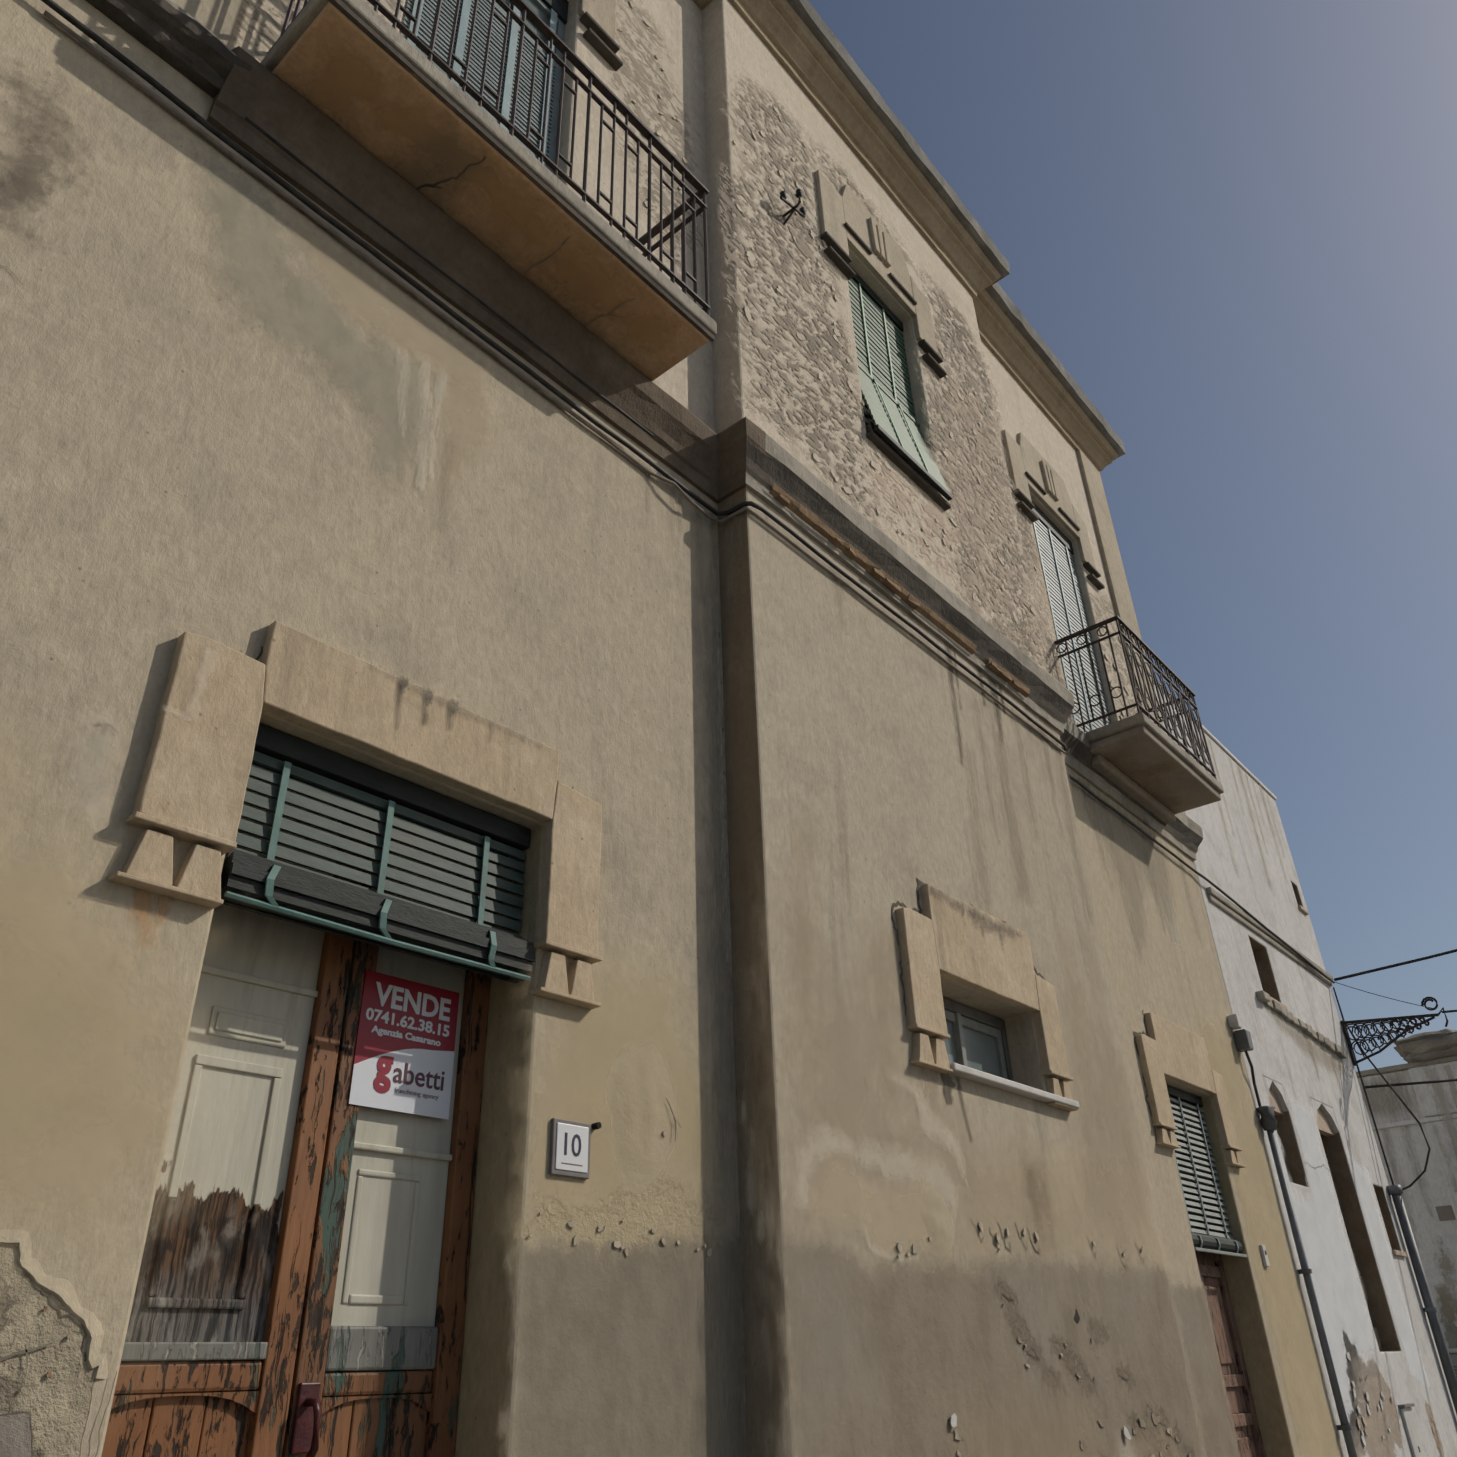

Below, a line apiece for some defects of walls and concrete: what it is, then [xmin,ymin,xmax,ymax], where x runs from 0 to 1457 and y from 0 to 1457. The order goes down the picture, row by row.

leakage [0,81,70,219]
peeling [611,0,699,261]
peeling [720,79,1066,697]
leakage [397,677,409,709]
flaking render [0,1229,108,1457]
peeling [522,1170,722,1257]
peeling [970,1218,1040,1253]
peeling [1266,1103,1402,1457]
peeling [1348,1155,1427,1383]
flaking render [950,1413,964,1457]
flaking render [1123,1406,1193,1457]
flaking render [1426,1403,1444,1457]